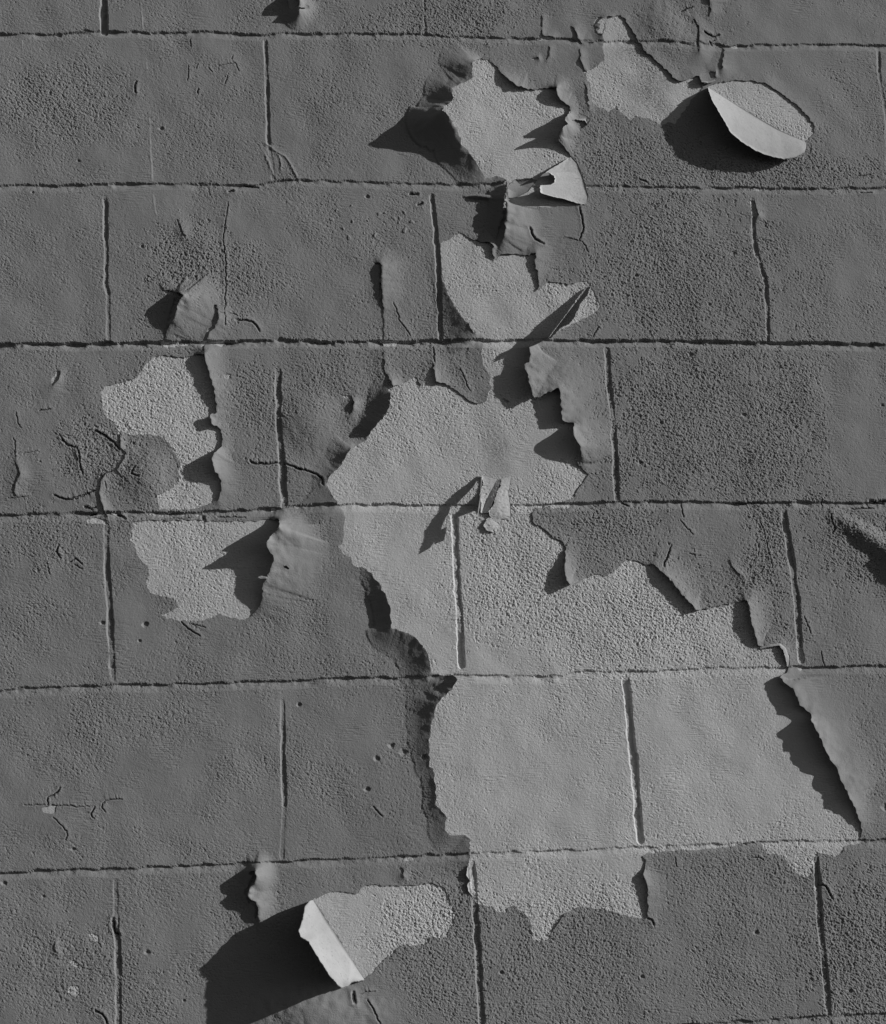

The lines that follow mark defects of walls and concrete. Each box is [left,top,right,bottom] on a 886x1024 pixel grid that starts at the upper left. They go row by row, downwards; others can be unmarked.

crack [56,431,137,519]
peeling [100,12,877,940]
peeling [298,856,455,989]